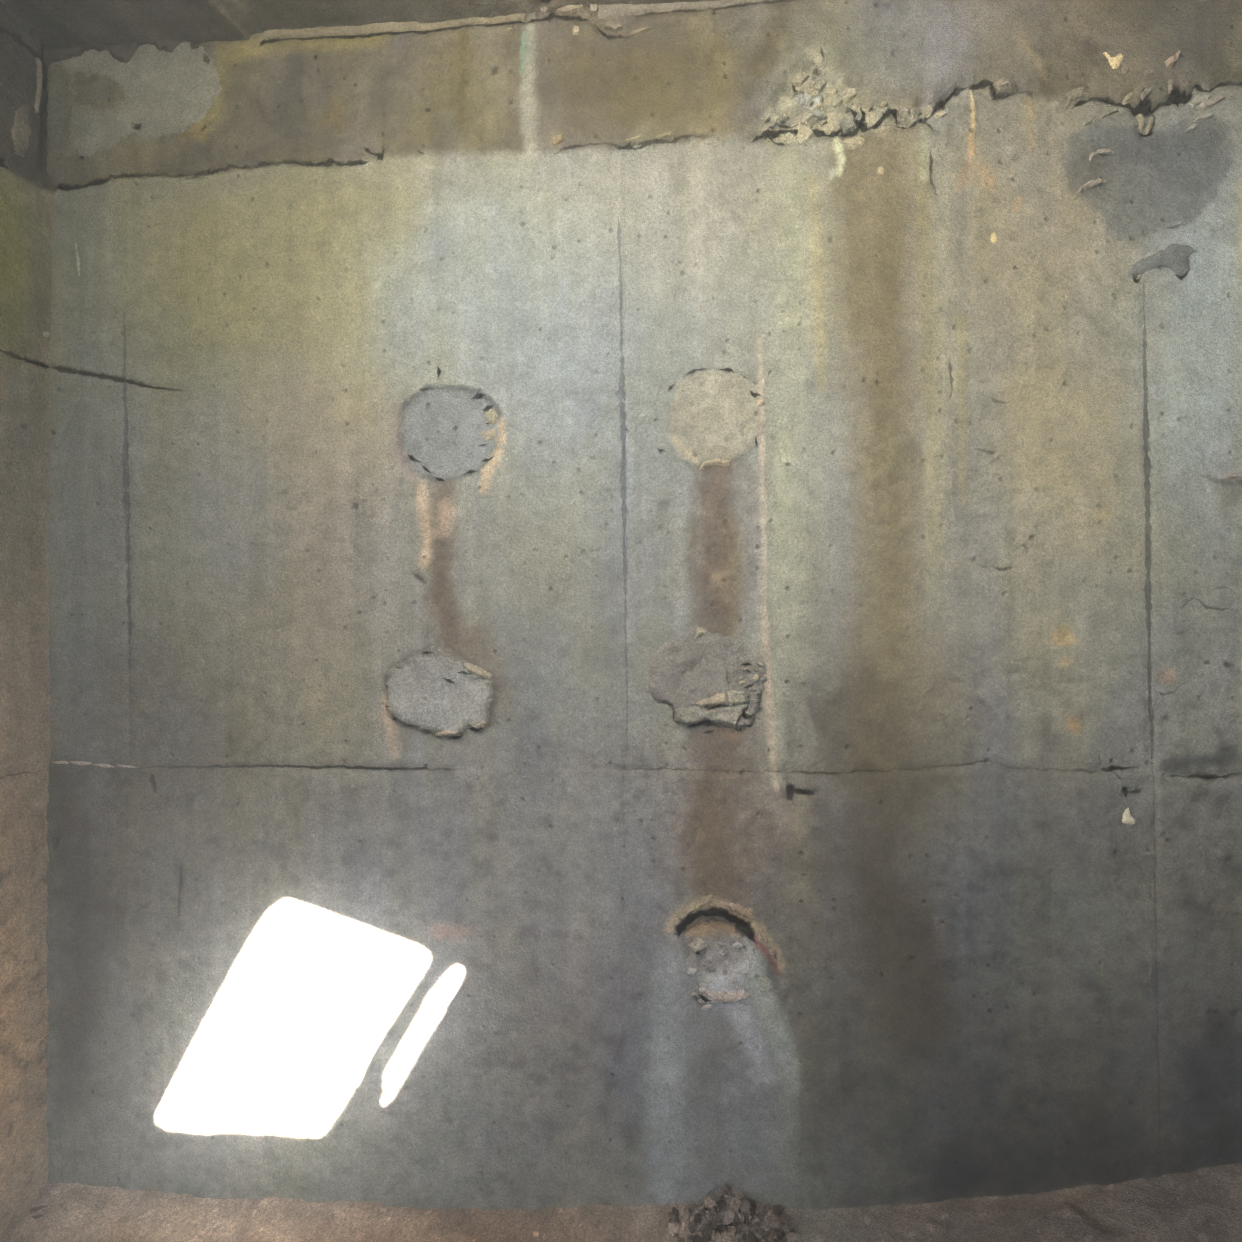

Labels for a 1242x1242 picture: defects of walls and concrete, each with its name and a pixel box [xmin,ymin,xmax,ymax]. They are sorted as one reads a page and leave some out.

spalling [739,39,938,151]
crack [897,78,1033,199]
water stain [1060,112,1238,246]
crack [1066,51,1242,137]
crack [0,326,179,734]
water stain [658,69,1152,1091]